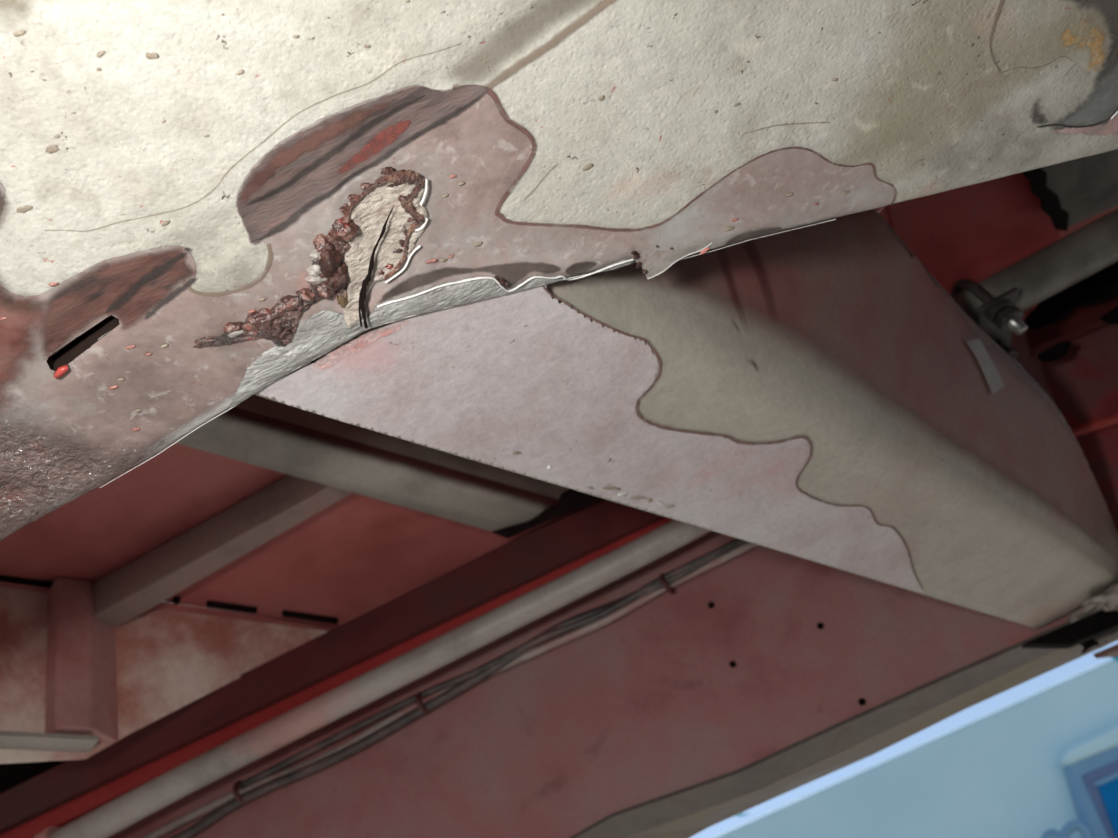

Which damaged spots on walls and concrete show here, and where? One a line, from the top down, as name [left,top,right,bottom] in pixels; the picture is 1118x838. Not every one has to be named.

water stain [989,0,1004,72]
water stain [1033,0,1118,129]
peeling [46,134,60,154]
water stain [0,85,924,592]
spalling [100,167,836,488]